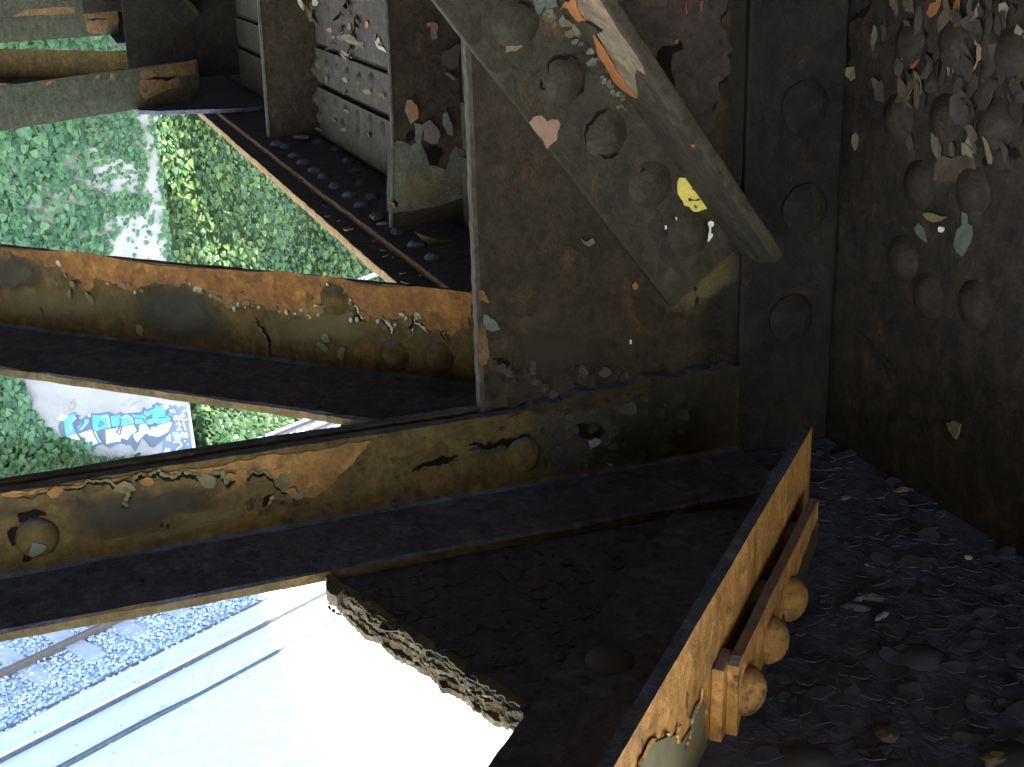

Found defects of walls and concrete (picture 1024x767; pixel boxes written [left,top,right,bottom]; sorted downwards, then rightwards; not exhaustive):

corrosion [139,59,196,100]
peeling [533,0,646,111]
peeling [868,0,1024,184]
peeling [529,115,560,149]
peeling [376,100,465,225]
peeling [914,211,973,257]
crack [253,317,272,356]
corrosion [1,248,632,409]
corrosion [1,476,142,498]
corrosion [156,440,372,498]
crack [412,434,536,475]
peeling [637,699,708,767]